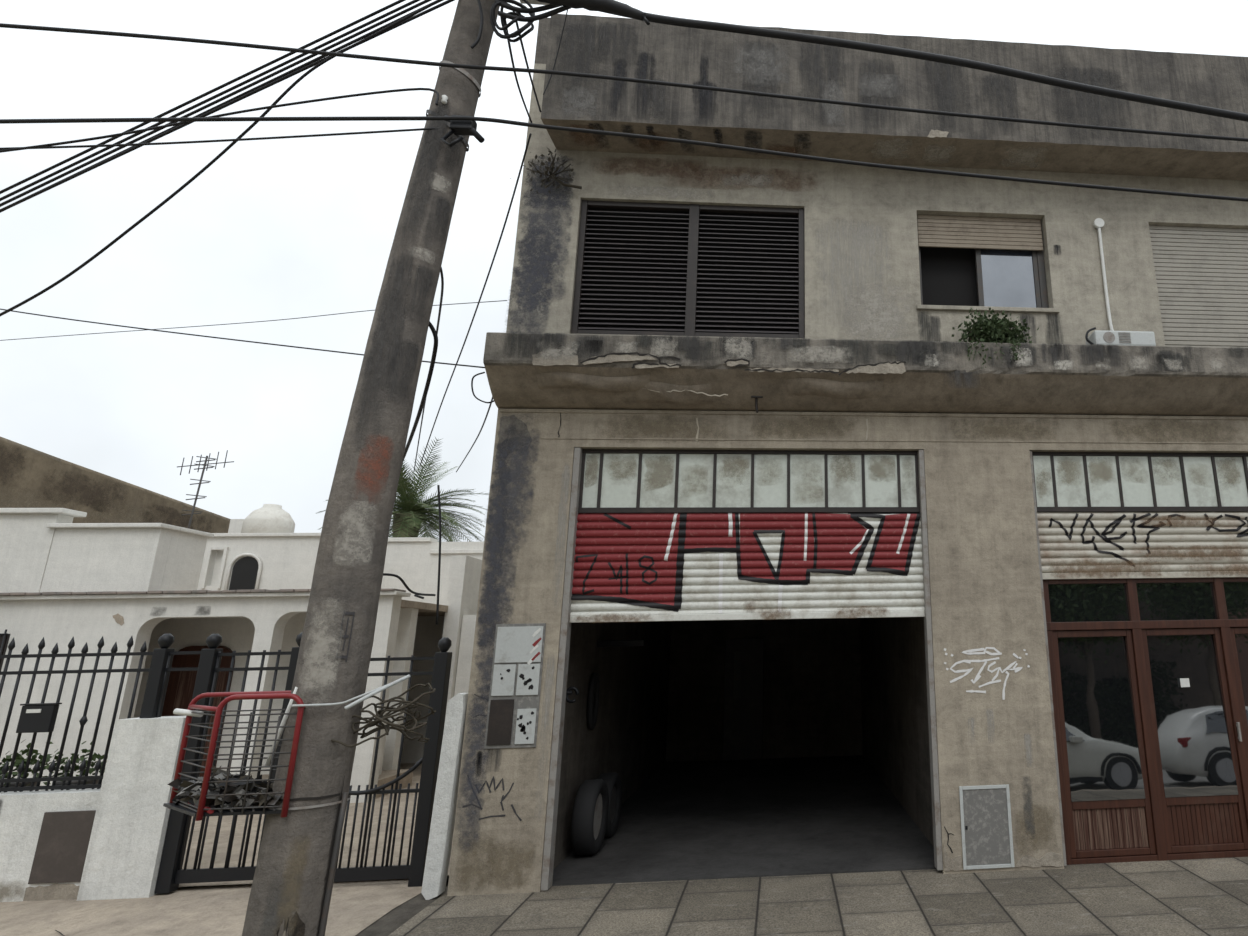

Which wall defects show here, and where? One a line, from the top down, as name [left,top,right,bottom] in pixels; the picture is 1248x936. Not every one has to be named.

water stain [693,58,722,144]
water stain [508,156,603,359]
water stain [619,224,969,365]
spalling [532,351,679,369]
spalling [726,360,906,374]
water stain [988,314,1191,370]
water stain [461,426,537,885]